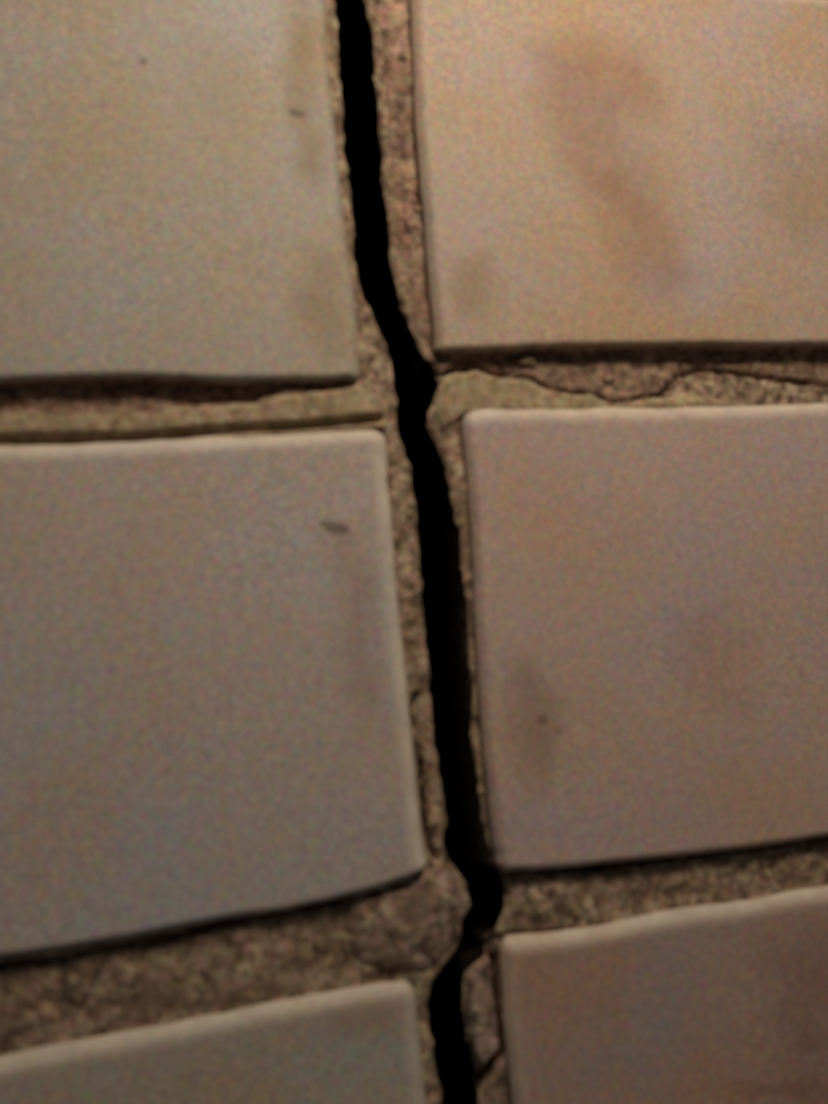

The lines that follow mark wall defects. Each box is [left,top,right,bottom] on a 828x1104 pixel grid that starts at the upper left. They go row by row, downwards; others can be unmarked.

crack [334,0,828,1104]